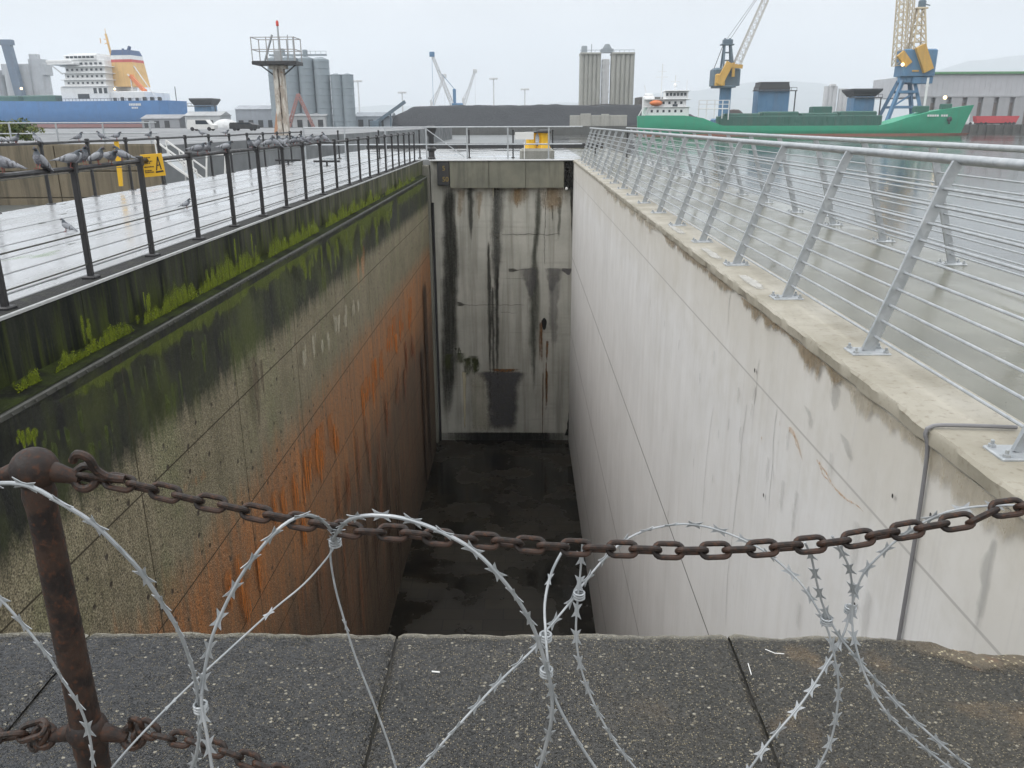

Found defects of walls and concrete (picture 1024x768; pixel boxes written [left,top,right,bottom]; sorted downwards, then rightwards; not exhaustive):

water stain [80,316,92,344]
water stain [442,188,573,440]